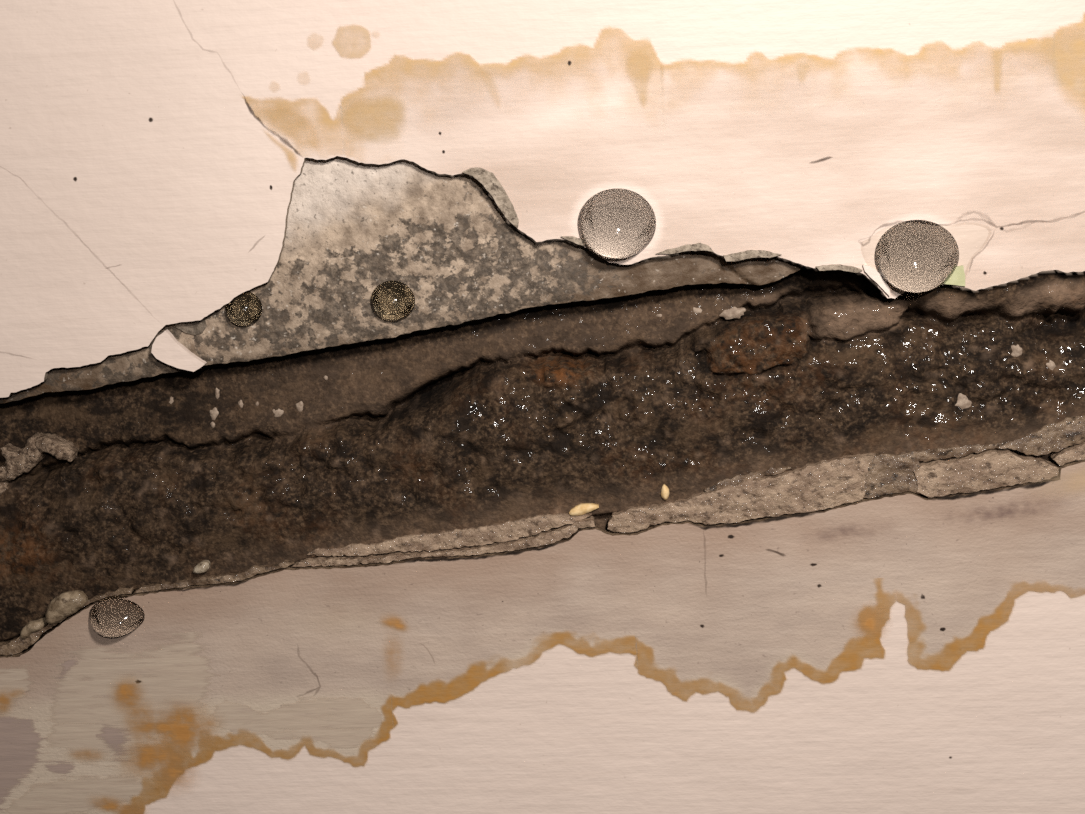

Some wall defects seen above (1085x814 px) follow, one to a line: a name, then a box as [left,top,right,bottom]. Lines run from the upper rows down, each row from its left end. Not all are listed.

leakage [245,25,618,130]
leakage [624,40,841,78]
leakage [861,44,969,62]
leakage [995,15,1085,102]
spalling [0,156,1085,655]
rust [384,618,405,629]
peeling [0,462,1085,814]
rust [531,581,891,711]
rust [908,589,1054,671]
rust [102,661,506,814]